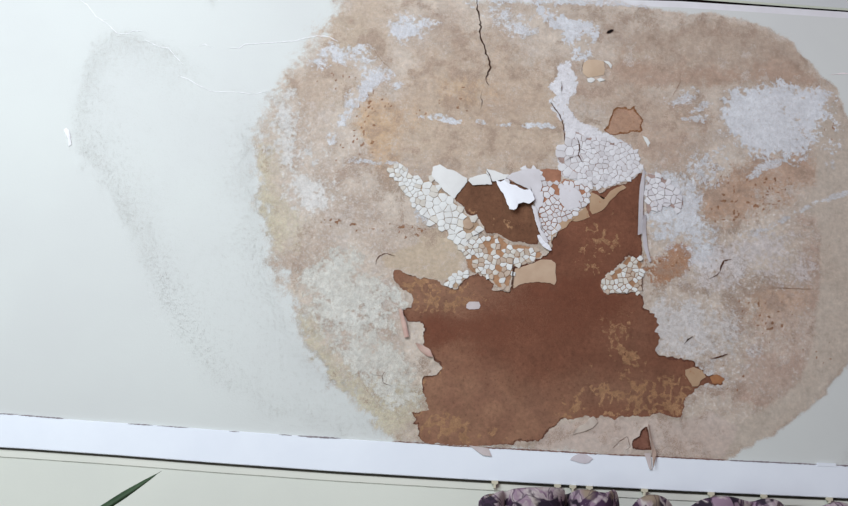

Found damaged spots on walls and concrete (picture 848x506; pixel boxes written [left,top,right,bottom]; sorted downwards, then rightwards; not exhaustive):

crack [476,2,491,106]
peeling [604,106,643,135]
damp [171,0,848,461]
peeling [393,165,724,447]
peeling [632,427,652,470]